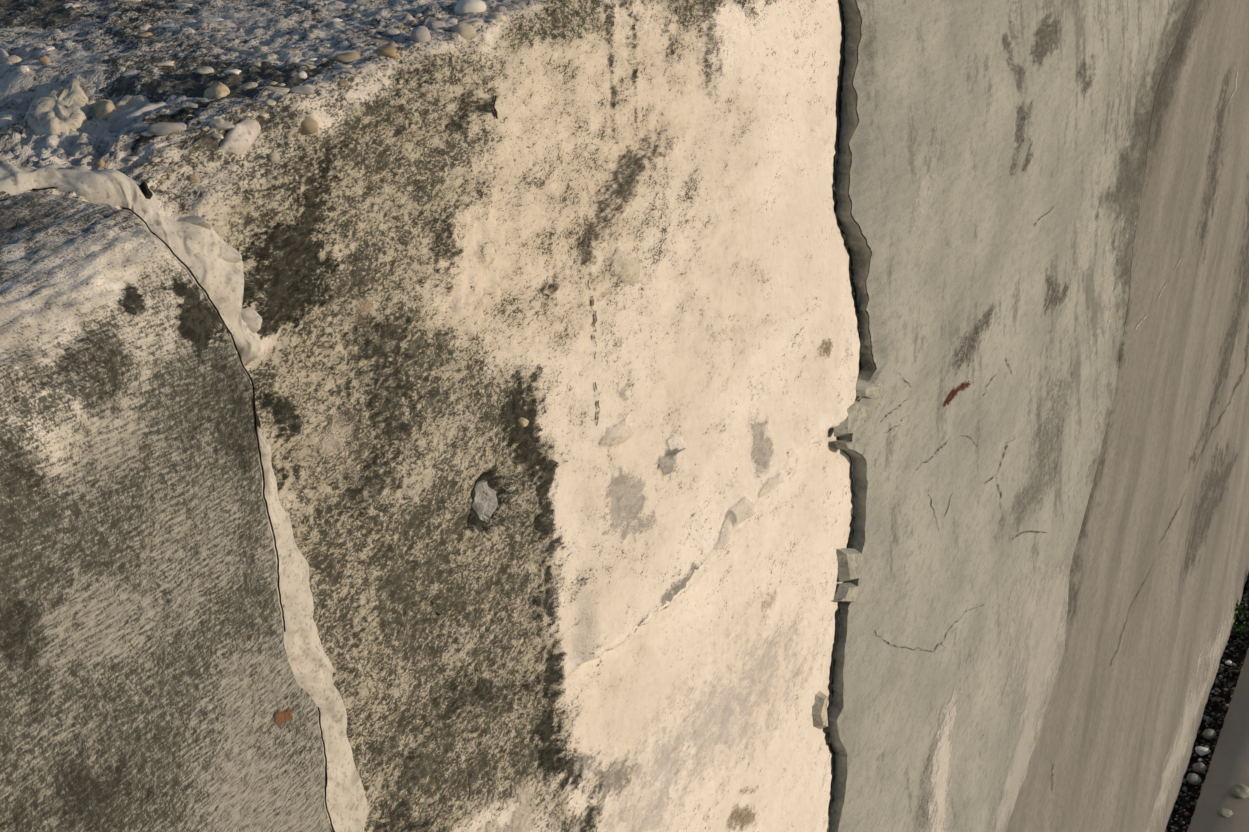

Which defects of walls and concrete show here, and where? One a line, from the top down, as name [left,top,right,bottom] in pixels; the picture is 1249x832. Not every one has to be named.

leakage [237,145,348,339]
leakage [579,109,675,290]
crack [833,0,862,371]
crack [122,207,286,632]
leakage [163,278,303,475]
leakage [333,311,427,517]
crack [837,437,855,548]
corrosion [942,381,970,408]
leakage [374,356,775,832]
corrosion [275,708,292,726]
crack [318,707,335,832]
crack [824,581,846,832]